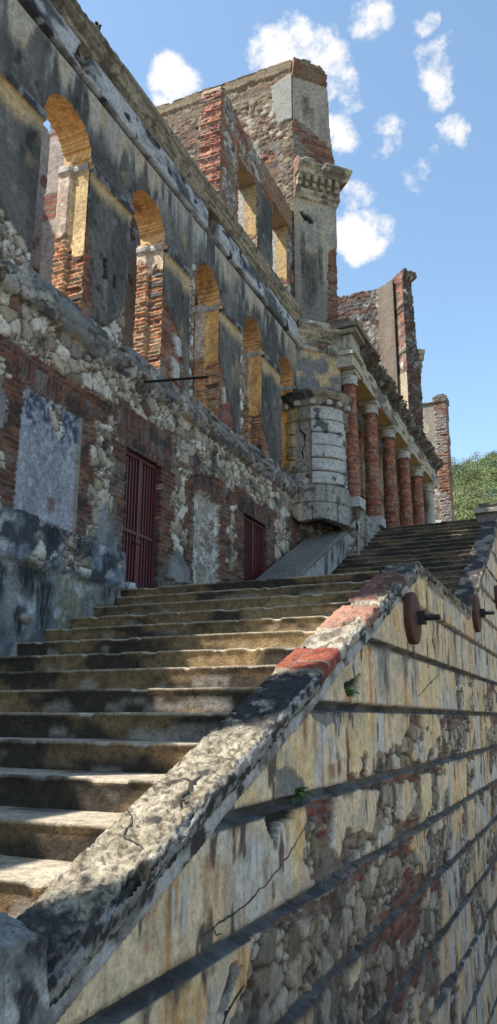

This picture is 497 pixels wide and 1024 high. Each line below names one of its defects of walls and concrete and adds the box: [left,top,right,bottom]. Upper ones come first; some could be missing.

damp [301,235,323,304]
spalling [215,330,247,438]
crack [299,425,307,460]
damp [0,563,52,629]
flaking render [165,549,192,584]
crack [156,773,203,807]
crack [123,809,144,849]
spalling [218,673,497,1024]
crack [200,828,305,938]